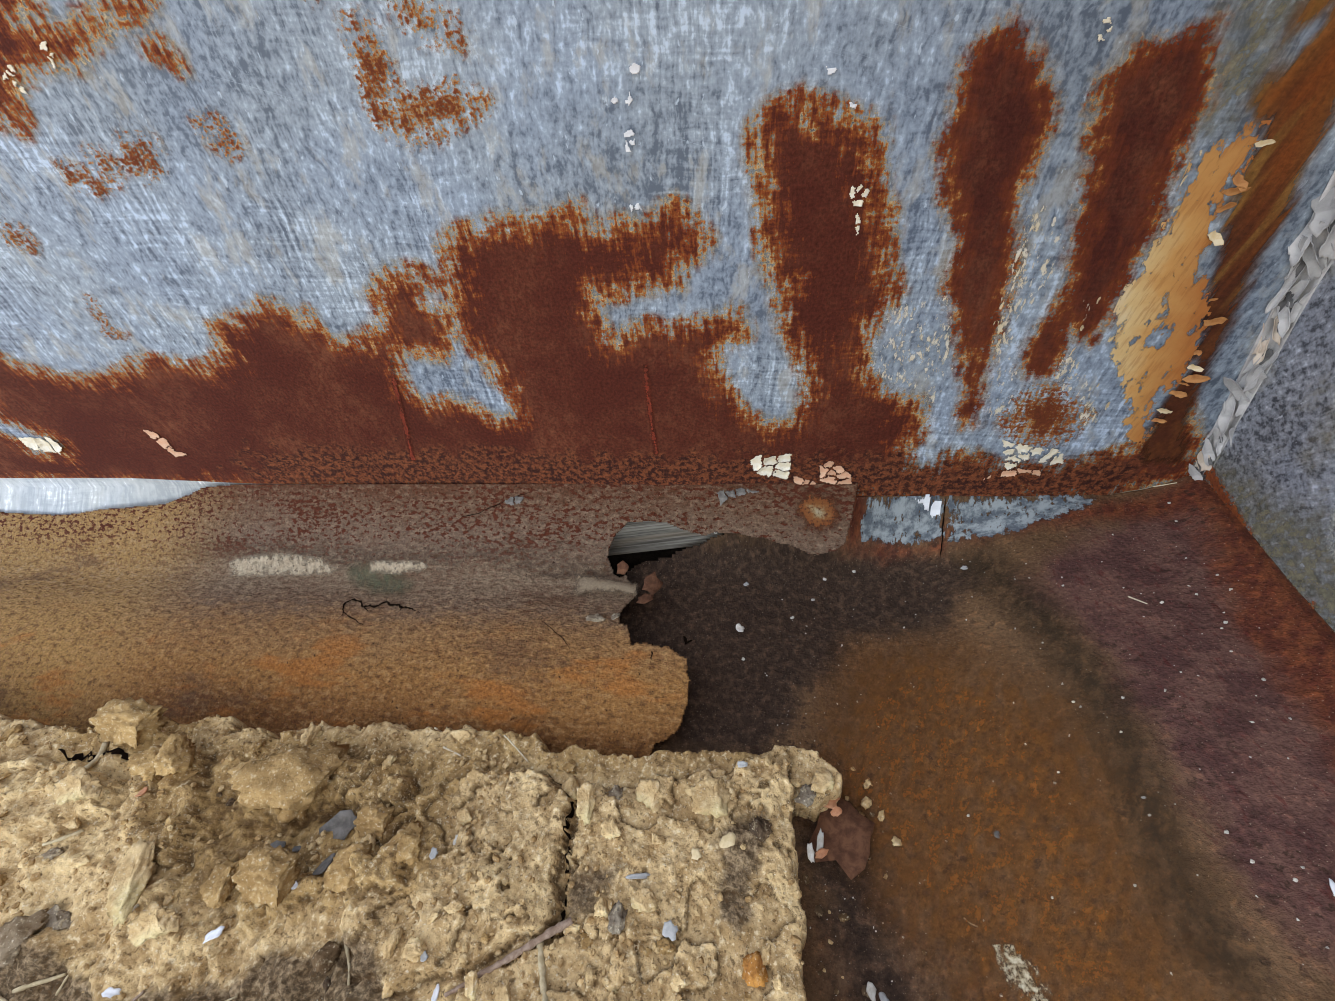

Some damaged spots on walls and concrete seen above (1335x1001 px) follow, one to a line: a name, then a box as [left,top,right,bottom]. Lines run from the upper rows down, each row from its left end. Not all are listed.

rust [0,0,1335,535]
peeling [717,488,759,506]
peeling [750,453,852,485]
peeling [1055,120,1335,480]
rust [809,655,1203,1001]